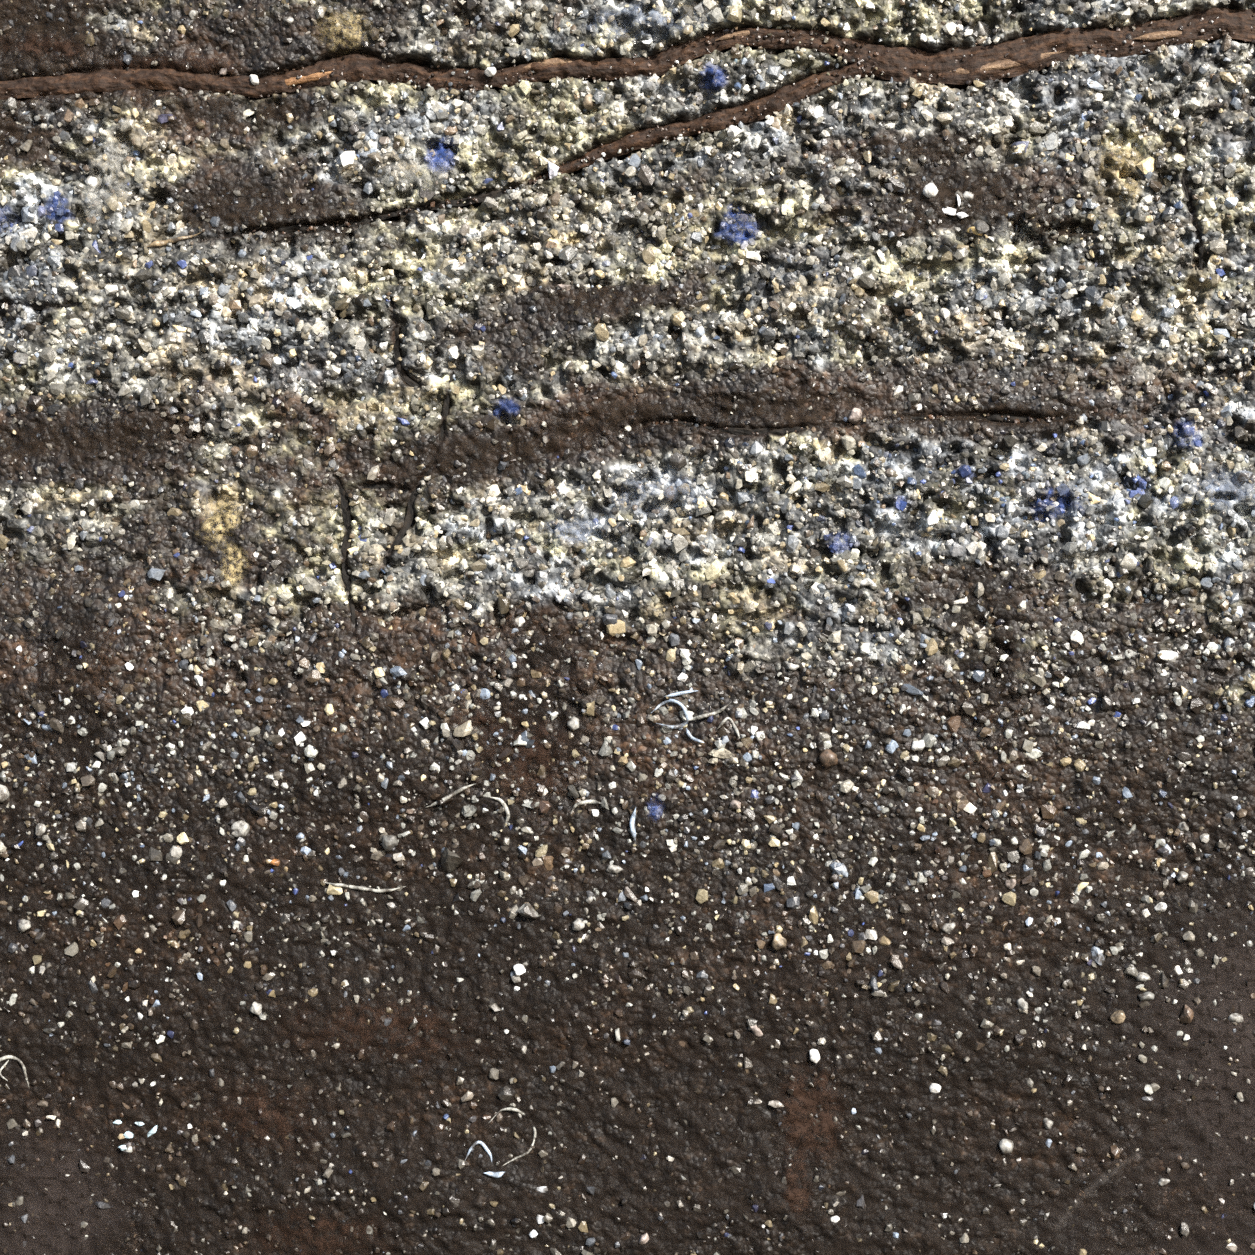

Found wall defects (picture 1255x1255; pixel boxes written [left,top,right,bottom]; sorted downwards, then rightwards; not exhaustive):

crack [0,7,1255,242]
crack [1178,109,1203,270]
crack [618,421,806,435]
crack [911,409,1101,423]